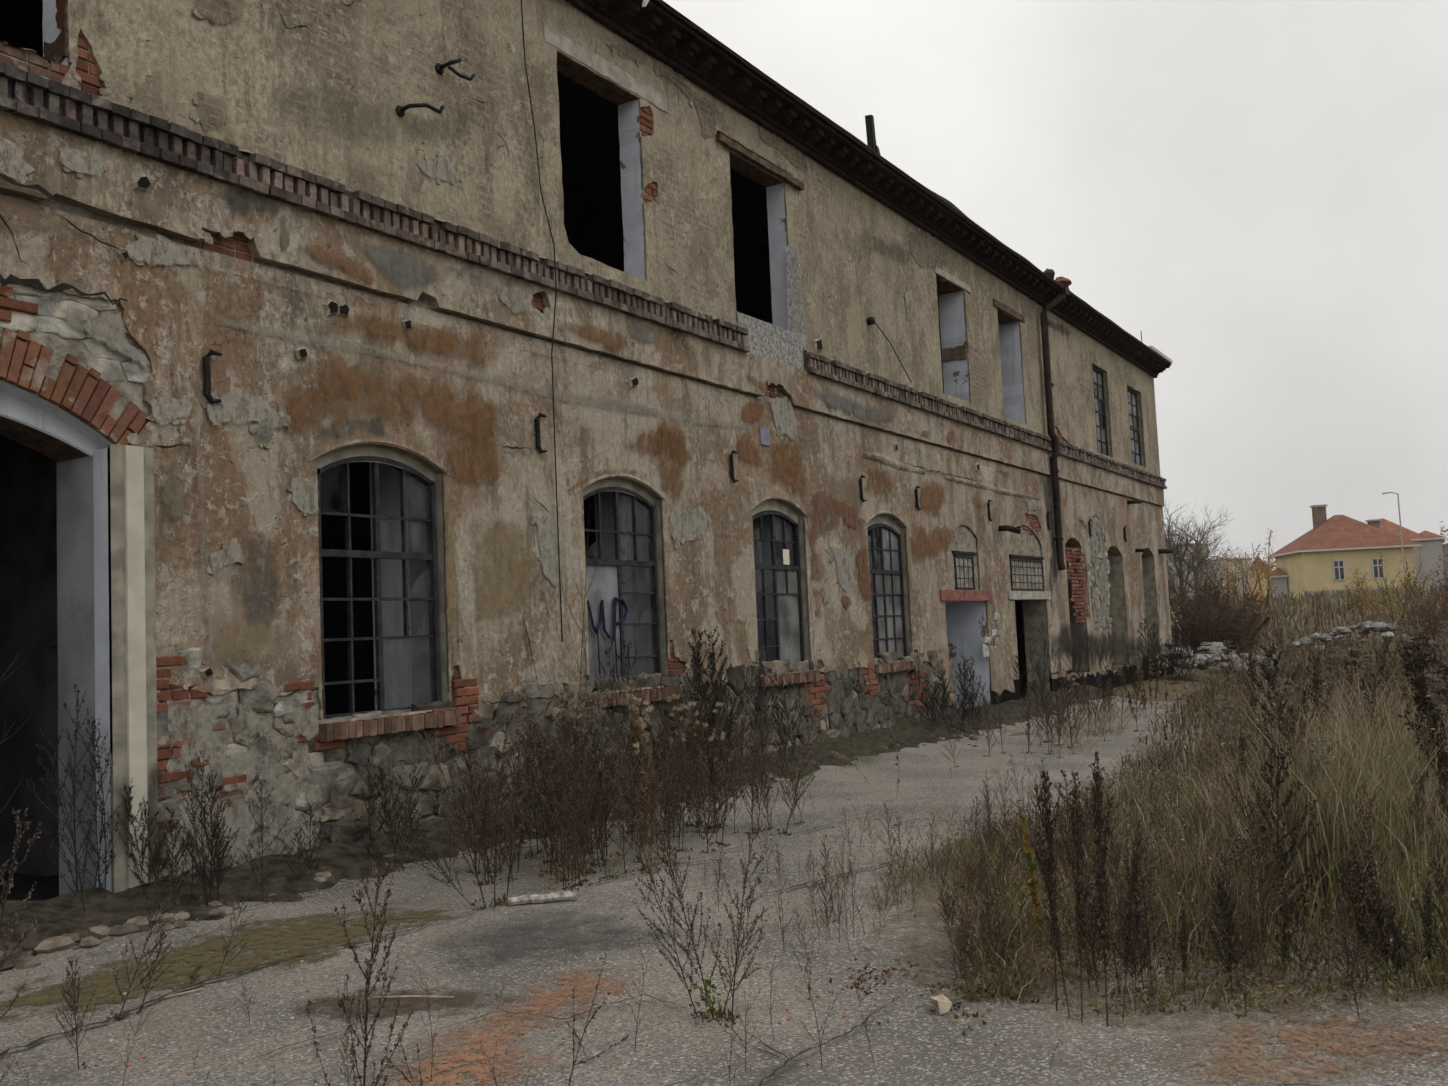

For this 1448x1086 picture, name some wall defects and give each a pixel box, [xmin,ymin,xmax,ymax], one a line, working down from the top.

spalling [0,0,108,100]
crack [0,173,128,305]
peeling [117,226,255,266]
spalling [0,282,293,449]
spalling [156,648,344,880]
flaking render [432,665,491,751]